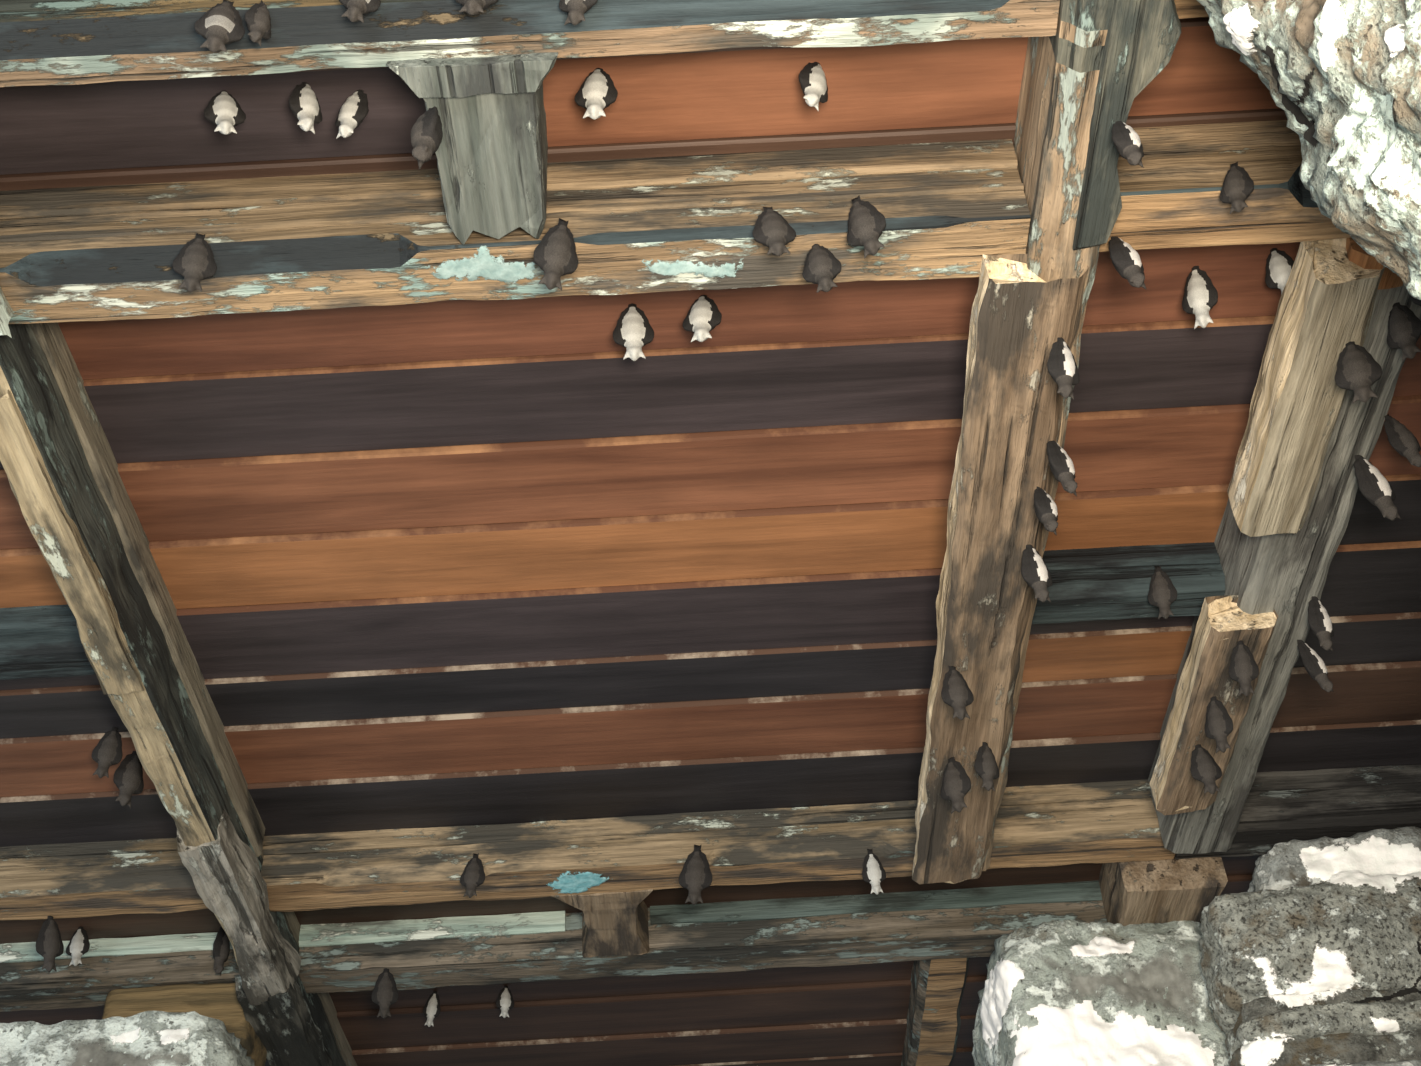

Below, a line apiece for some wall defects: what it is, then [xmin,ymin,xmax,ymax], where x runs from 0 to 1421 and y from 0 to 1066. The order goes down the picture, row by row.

peeling [426,246,541,283]
peeling [642,259,744,278]